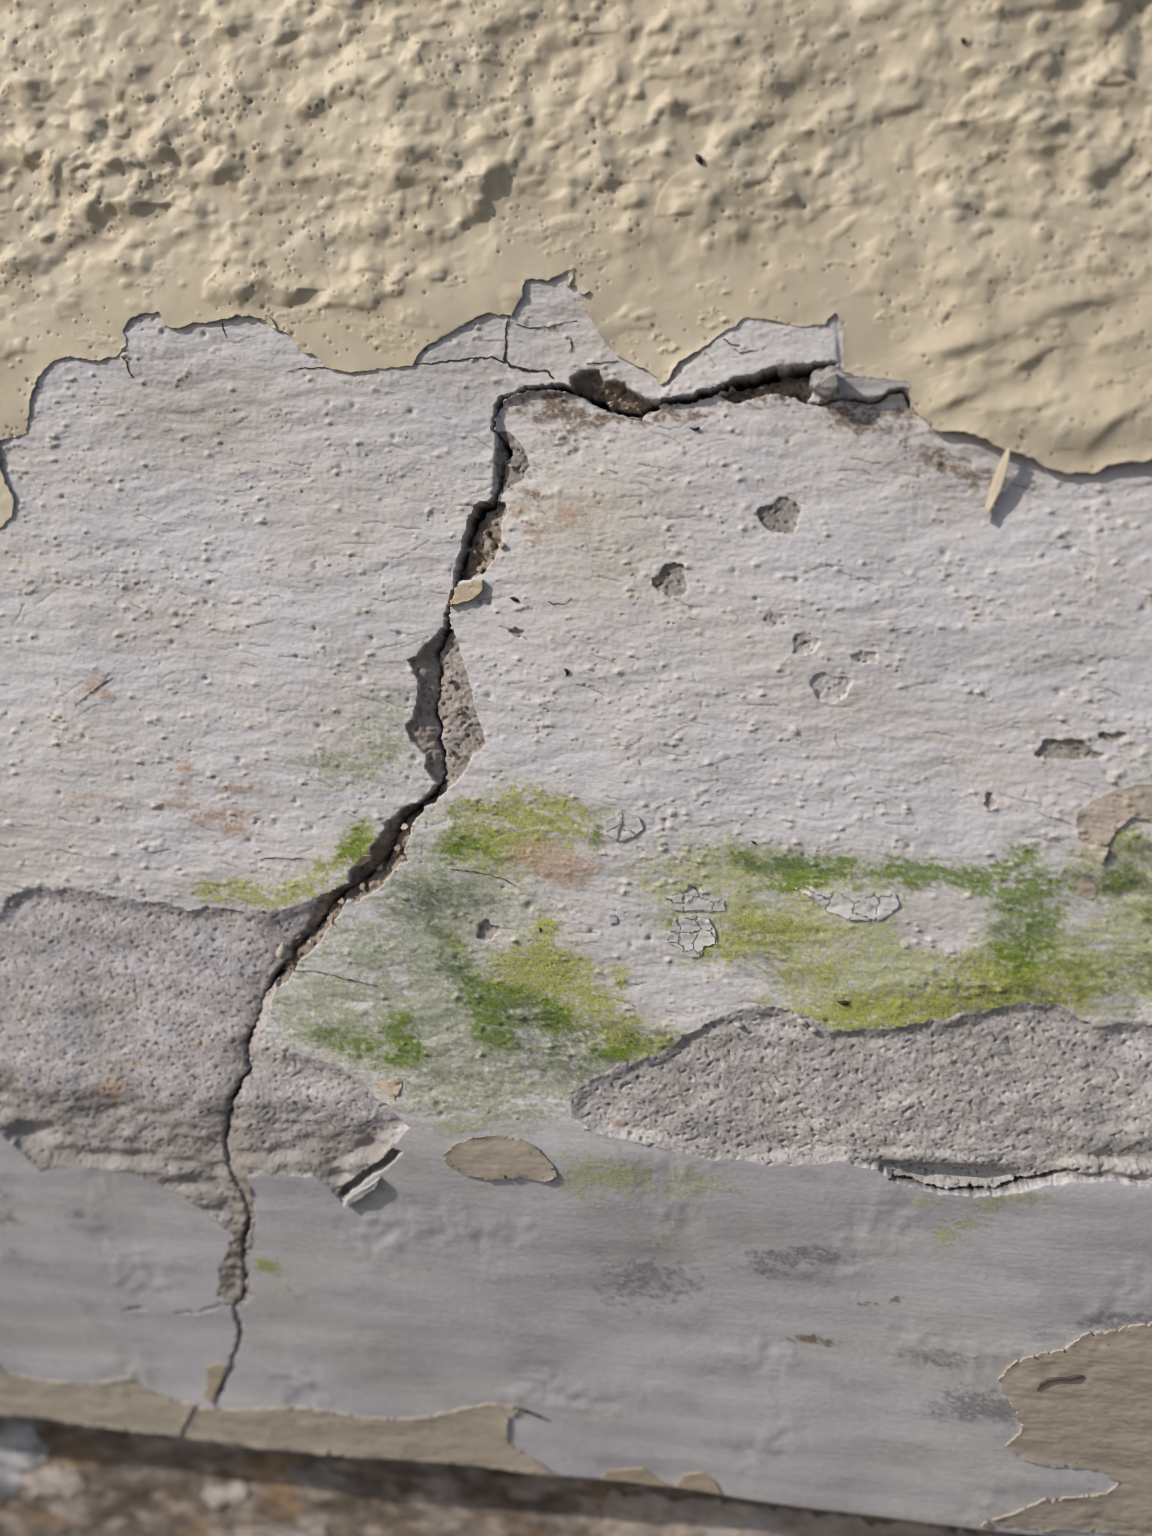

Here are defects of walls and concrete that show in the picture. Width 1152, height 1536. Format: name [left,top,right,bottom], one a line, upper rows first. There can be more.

crack [120,316,911,1437]
peeling [0,269,1152,1307]